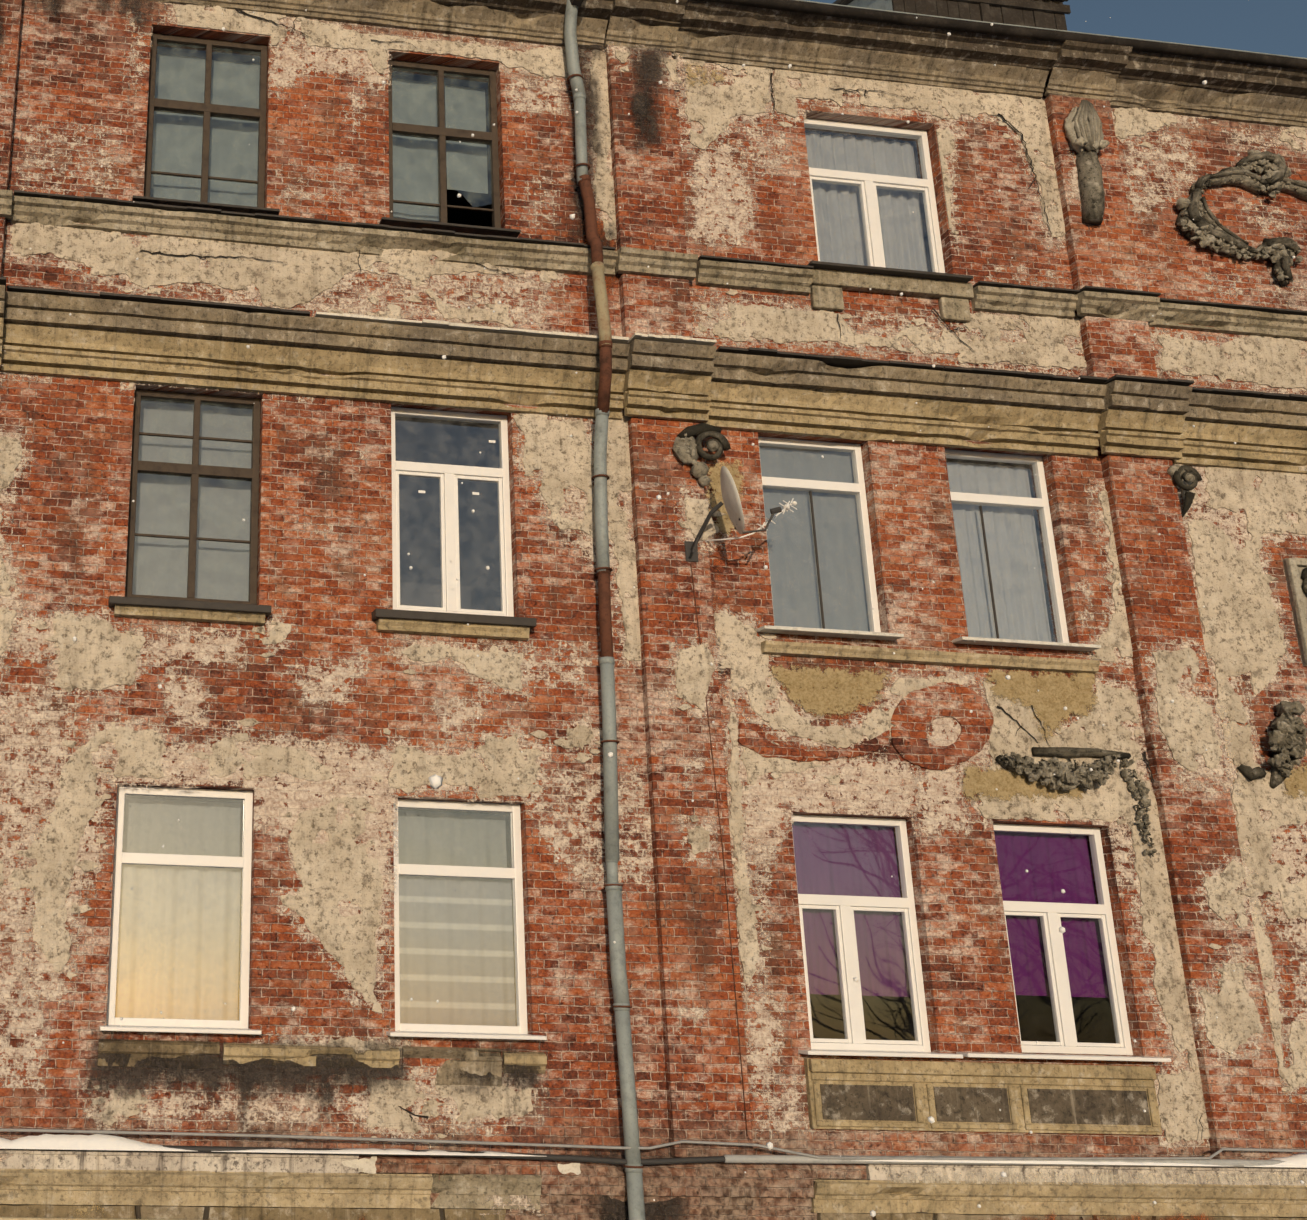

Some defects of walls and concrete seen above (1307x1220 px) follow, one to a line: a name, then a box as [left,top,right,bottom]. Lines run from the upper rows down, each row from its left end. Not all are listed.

flaking render [143,1,1067,252]
flaking render [1111,107,1219,148]
flaking render [1273,126,1307,158]
flaking render [690,288,1087,376]
flaking render [0,423,196,980]
flaking render [191,718,333,788]
flaking render [251,605,300,662]
flaking render [371,635,603,812]
flaking render [663,459,1307,1156]
flaking render [271,797,395,1014]
flaking render [74,1069,148,1131]
flaking render [247,1026,548,1174]